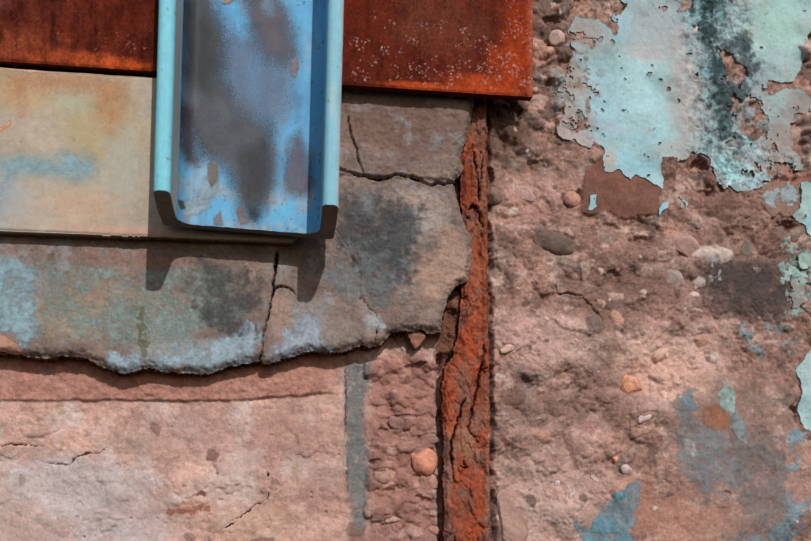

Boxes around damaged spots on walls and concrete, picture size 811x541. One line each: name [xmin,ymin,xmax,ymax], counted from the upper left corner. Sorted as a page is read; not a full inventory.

water stain [182,0,294,125]
water stain [179,103,198,167]
crack [339,130,451,187]
crack [466,144,484,241]
peeling [550,0,811,236]
crack [260,252,292,362]
peeling [738,323,778,361]
peeling [773,236,811,316]
crack [449,345,486,482]
peeling [708,381,747,444]
peeling [784,350,811,478]
peeling [728,482,811,541]